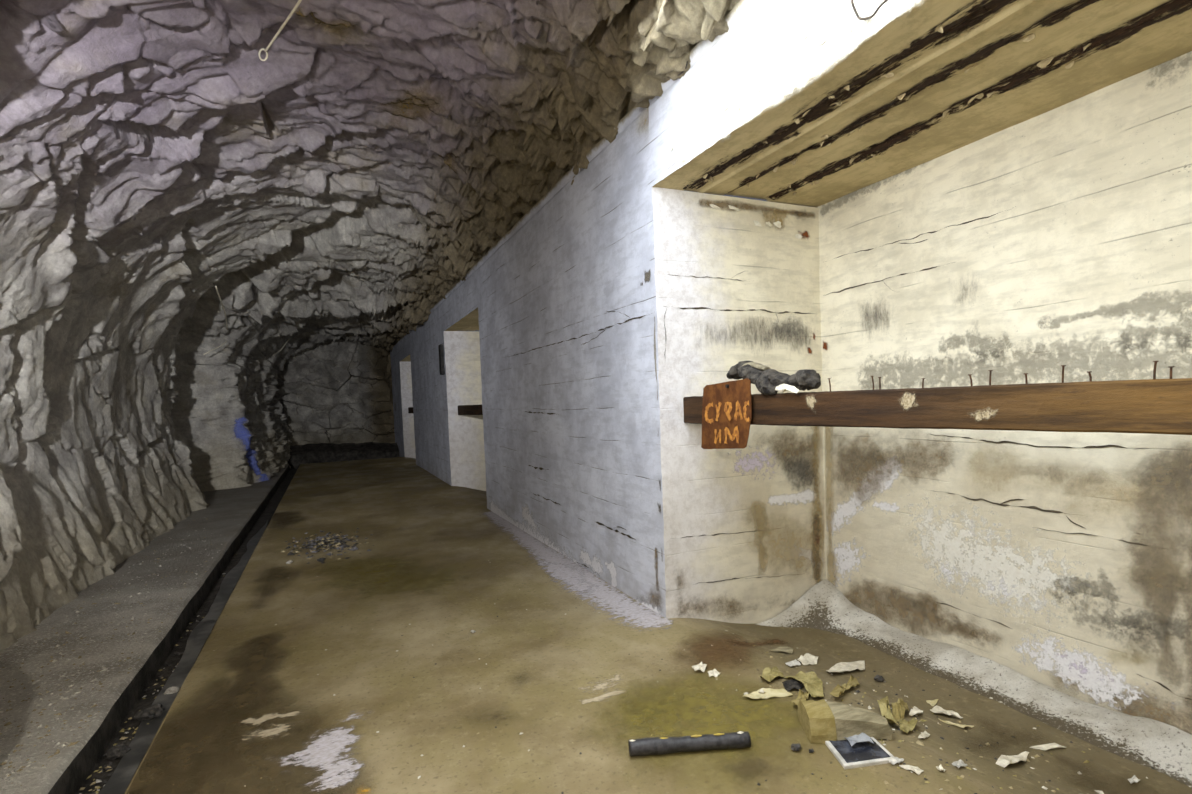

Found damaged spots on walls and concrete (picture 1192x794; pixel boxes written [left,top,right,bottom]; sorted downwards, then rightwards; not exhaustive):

peeling [681,0,921,165]
damp [730,322,807,345]
damp [865,308,884,328]
crack [923,489,1169,550]
damp [734,434,1192,735]